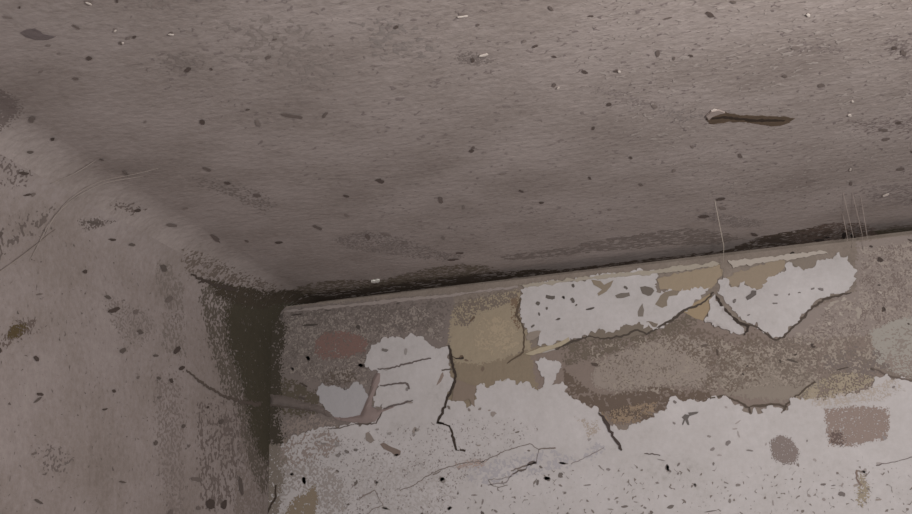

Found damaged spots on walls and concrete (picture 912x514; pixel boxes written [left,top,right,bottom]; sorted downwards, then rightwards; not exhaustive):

crack [507,293,525,364]
crack [556,292,852,350]
peeling [268,235,912,514]
crack [328,345,622,514]
crack [268,485,277,513]